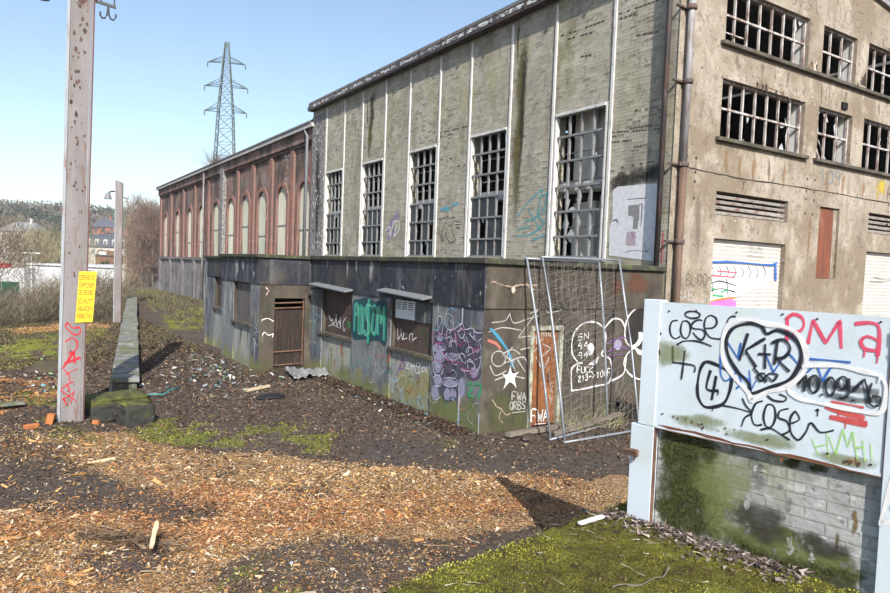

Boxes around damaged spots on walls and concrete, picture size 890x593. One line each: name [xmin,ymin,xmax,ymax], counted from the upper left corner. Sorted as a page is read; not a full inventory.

leakage [367,96,375,151]
leakage [513,28,527,212]
peeling [312,126,324,249]